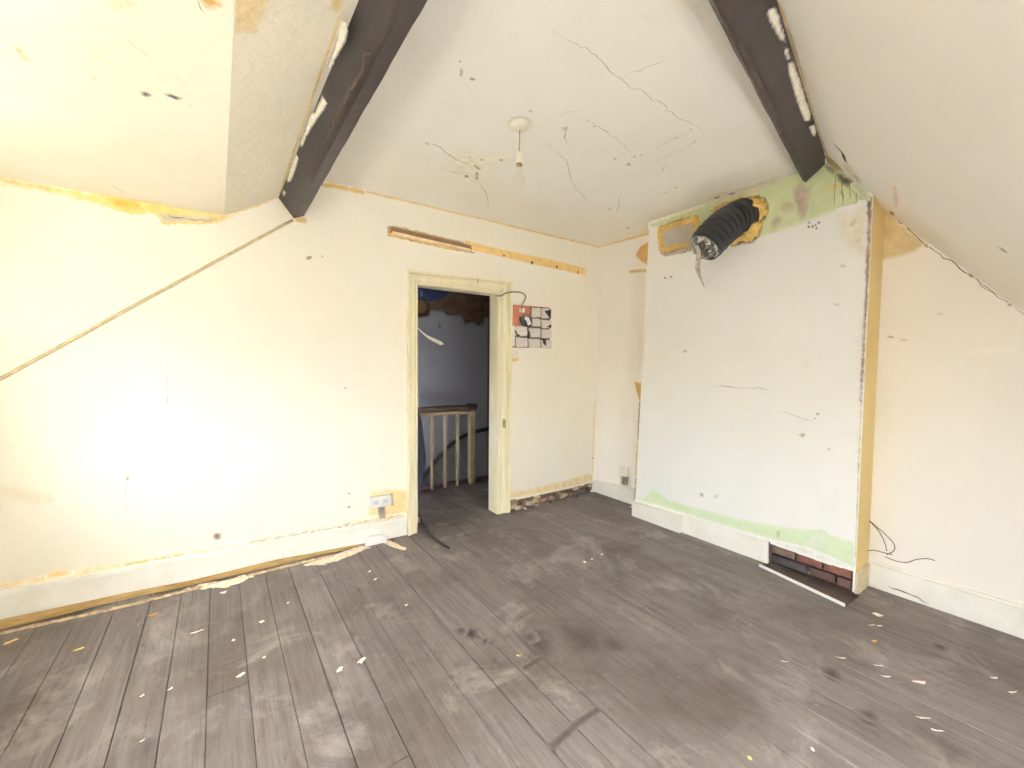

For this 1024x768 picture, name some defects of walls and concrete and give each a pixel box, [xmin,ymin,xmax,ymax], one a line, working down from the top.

peeling [0,0,350,225]
crack [553,31,705,169]
peeling [321,0,873,589]
peeling [0,487,407,589]